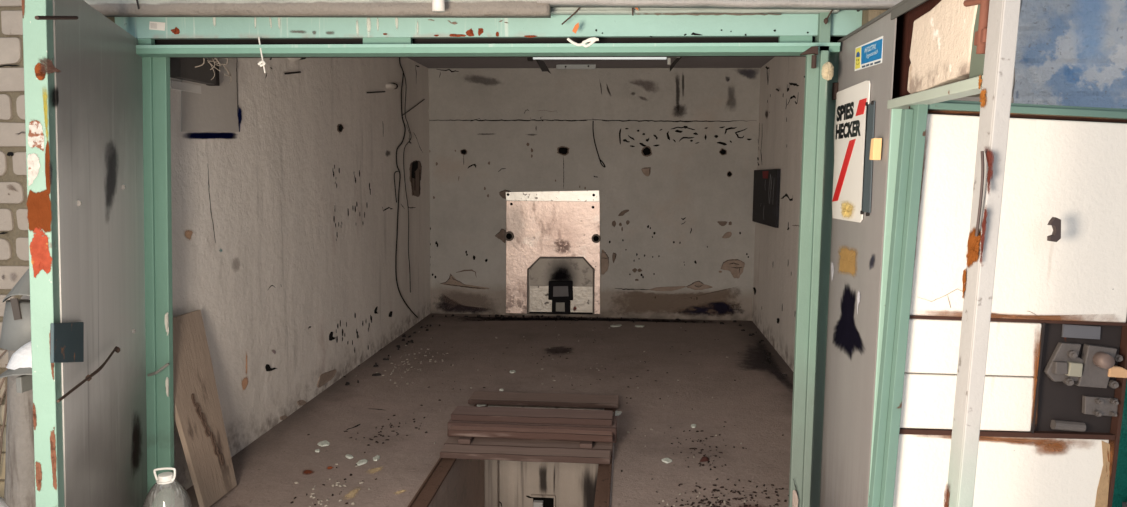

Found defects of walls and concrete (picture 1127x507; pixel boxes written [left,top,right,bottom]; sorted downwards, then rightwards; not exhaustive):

peeling [27,119,44,186]
rust [984,148,994,192]
rust [962,209,988,298]